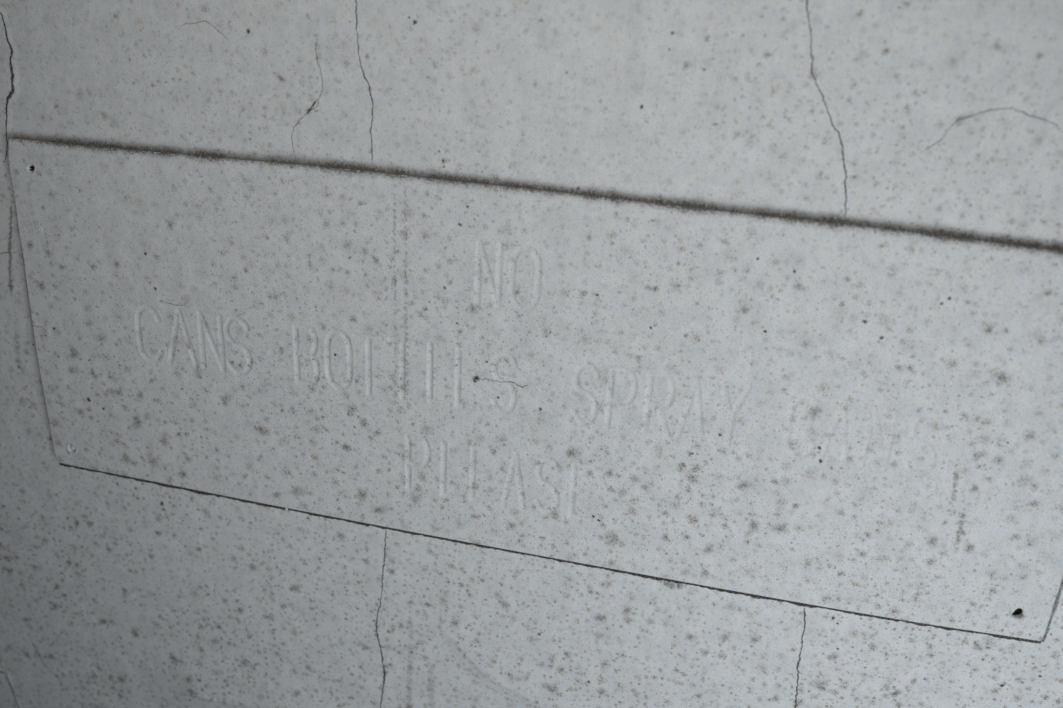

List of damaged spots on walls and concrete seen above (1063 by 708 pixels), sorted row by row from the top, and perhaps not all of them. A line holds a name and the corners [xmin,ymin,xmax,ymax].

crack [0,3,20,171]
crack [355,1,373,155]
crack [806,0,847,213]
crack [376,535,386,708]
crack [795,611,806,708]